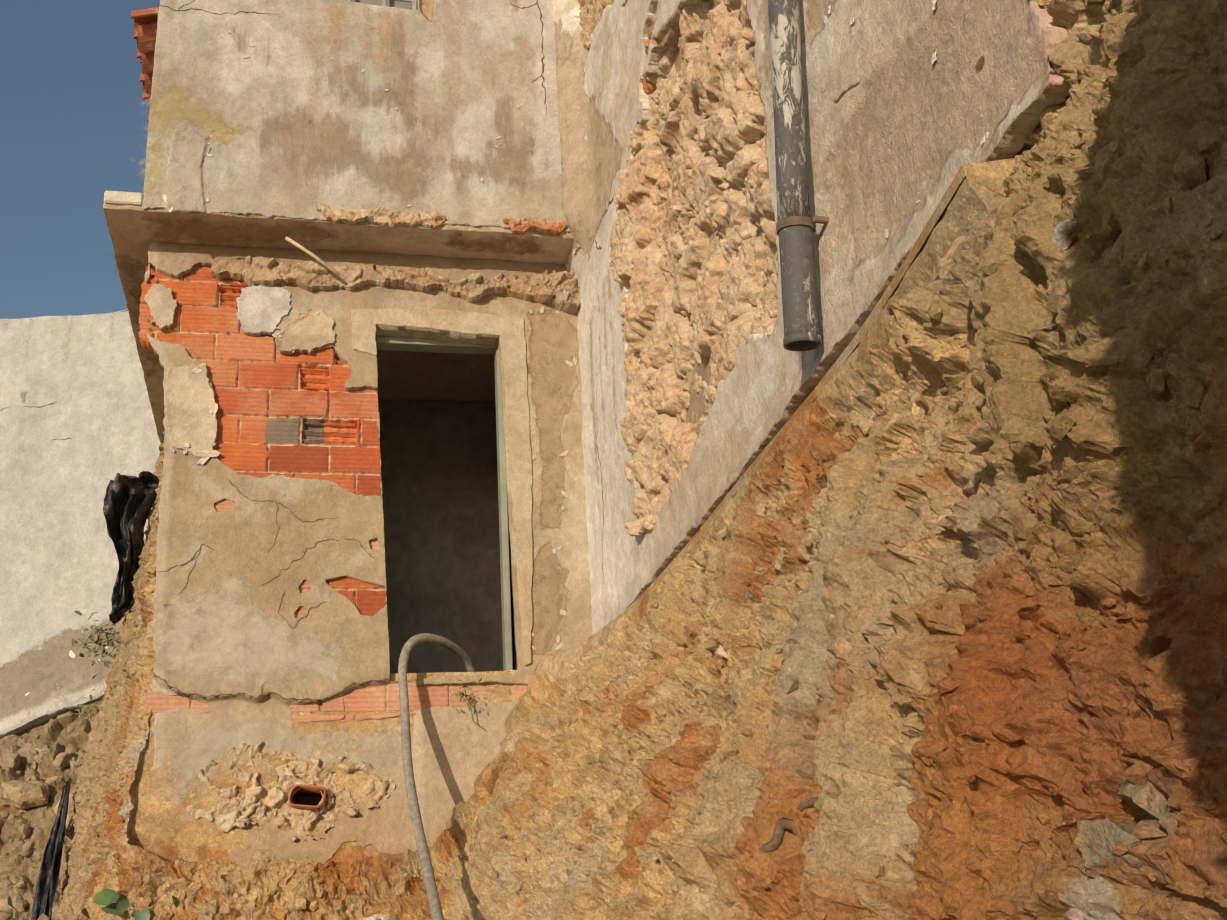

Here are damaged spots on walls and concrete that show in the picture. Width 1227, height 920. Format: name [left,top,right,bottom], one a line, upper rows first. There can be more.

crack [156,0,279,15]
spalling [138,0,778,655]
crack [220,457,376,628]
crack [162,544,214,648]
crack [150,670,398,705]
spalling [186,738,395,842]